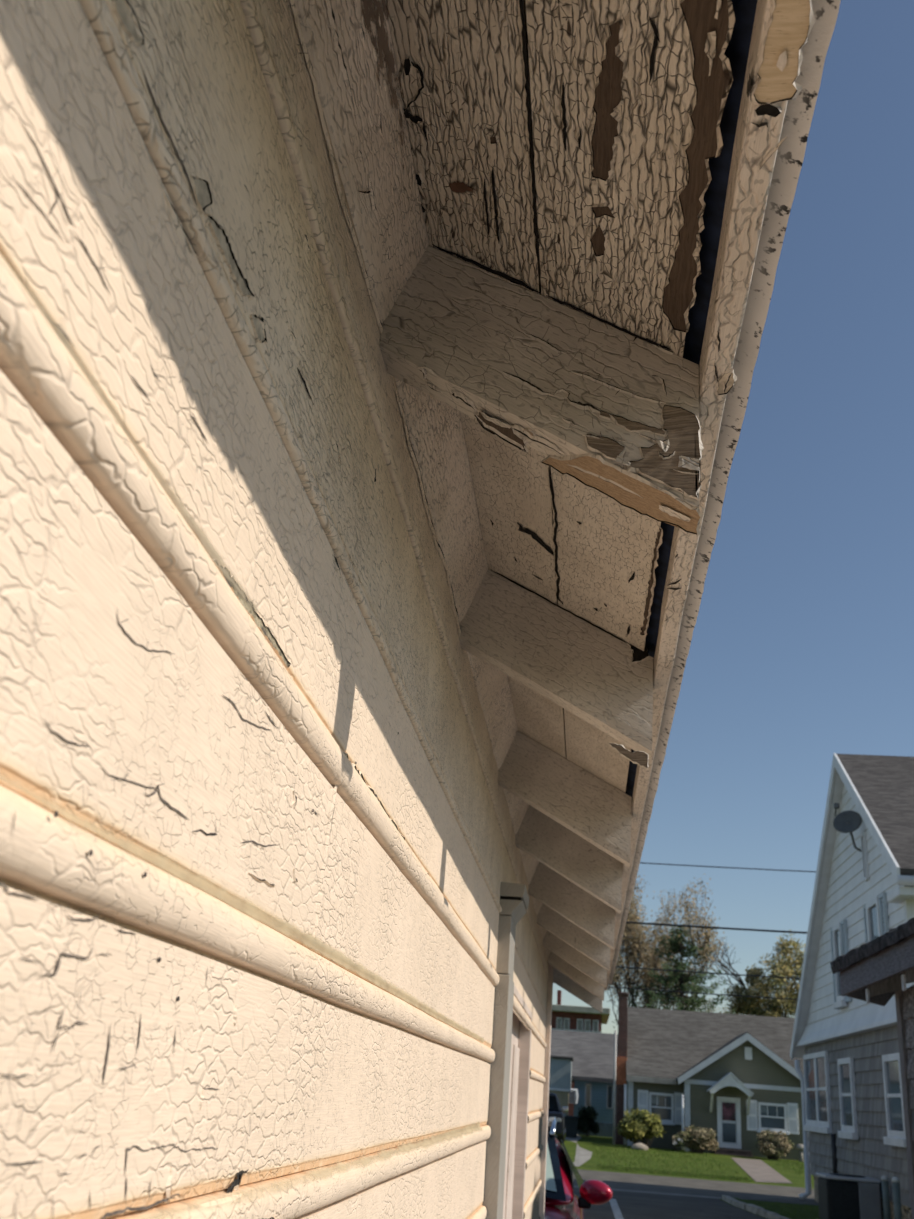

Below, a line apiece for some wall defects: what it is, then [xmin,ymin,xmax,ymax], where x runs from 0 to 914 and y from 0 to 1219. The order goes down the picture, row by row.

peeling [349,0,405,150]
peeling [590,18,628,181]
peeling [748,0,816,105]
peeling [590,202,617,256]
peeling [662,0,735,332]
crack [432,0,675,643]
peeling [541,405,704,635]
crack [44,718,277,847]
crack [19,913,136,976]
crack [53,996,149,1084]
crack [9,1144,218,1219]
crack [227,1169,249,1193]